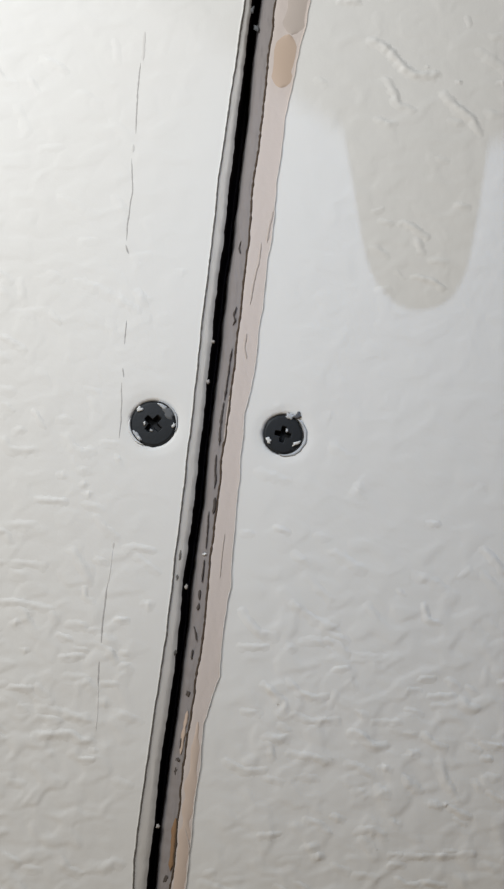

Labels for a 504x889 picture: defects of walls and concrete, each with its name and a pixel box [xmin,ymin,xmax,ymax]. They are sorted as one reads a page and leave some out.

crack [126,32,146,254]
leakage [271,0,308,88]
crack [132,0,277,889]